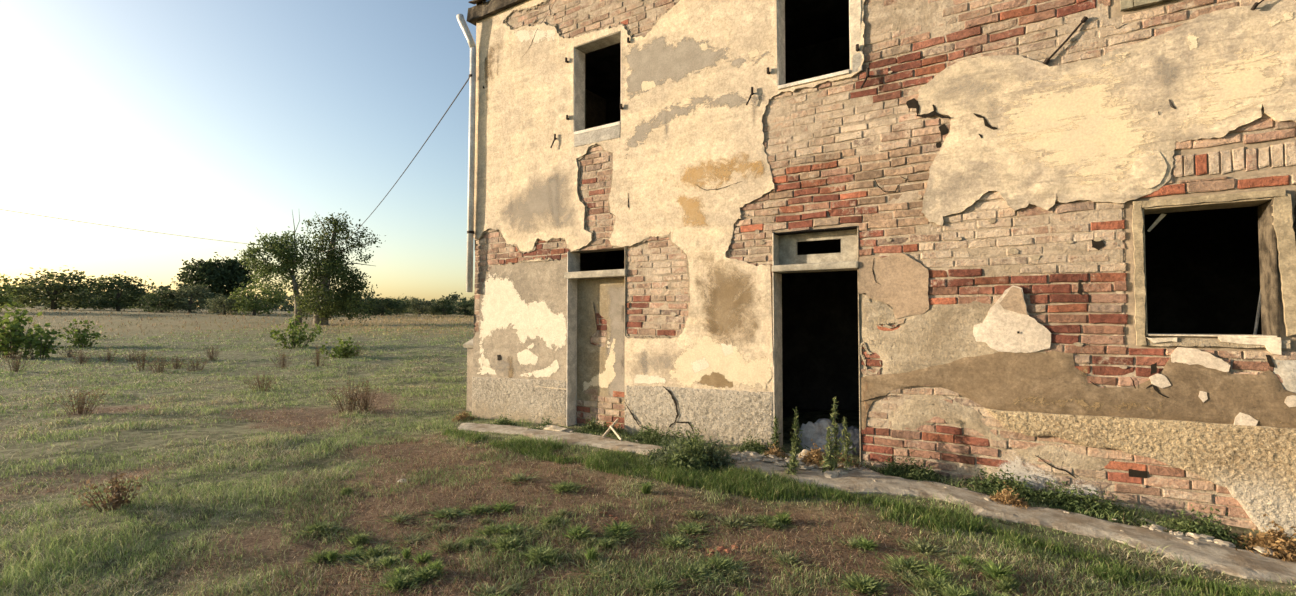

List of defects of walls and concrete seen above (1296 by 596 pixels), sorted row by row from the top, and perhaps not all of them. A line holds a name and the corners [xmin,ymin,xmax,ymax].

peeling [503,0,771,100]
flaking render [727,0,1296,407]
peeling [473,144,772,429]
damp [702,259,757,343]
crack [625,386,694,433]
flaking render [861,385,1258,530]